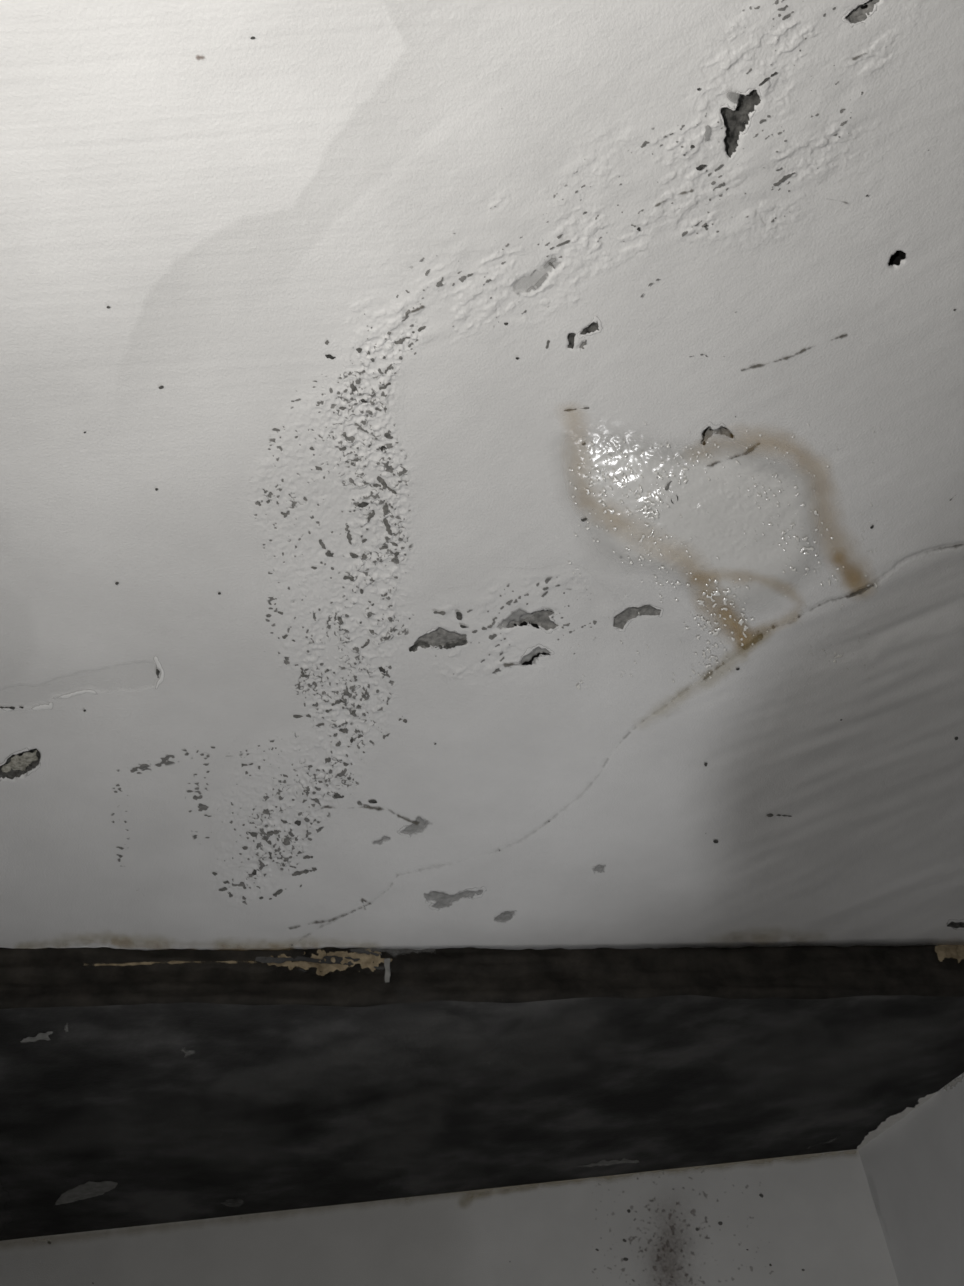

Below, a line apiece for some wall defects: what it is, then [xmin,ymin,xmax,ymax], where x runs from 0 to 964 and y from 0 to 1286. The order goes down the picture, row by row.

spalling [842,0,879,27]
spalling [705,72,777,158]
spalling [567,316,602,349]
leakage [567,425,877,687]
peeling [409,611,467,652]
peeling [498,609,558,667]
peeling [613,605,663,632]
crack [772,585,874,629]
spalling [0,748,40,779]
peeling [373,815,429,844]
spalling [424,887,486,911]
leakage [652,1151,854,1172]